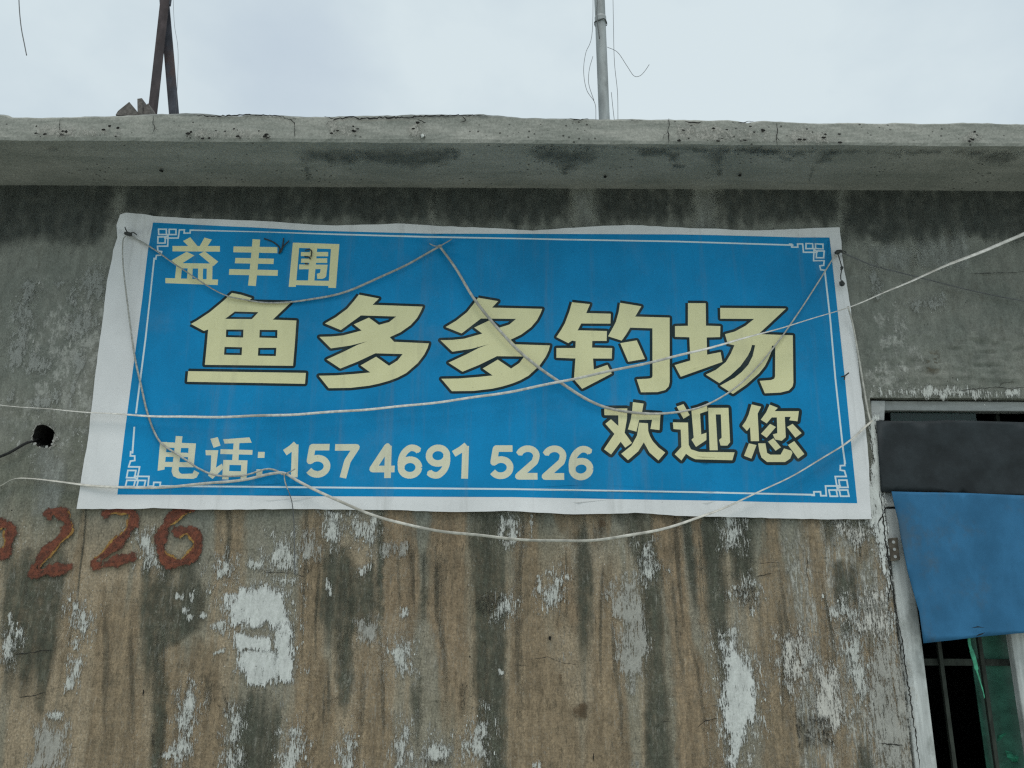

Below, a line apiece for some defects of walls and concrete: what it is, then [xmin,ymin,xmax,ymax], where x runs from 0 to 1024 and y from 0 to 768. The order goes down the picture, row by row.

leakage [0,185,112,242]
leakage [126,178,568,227]
leakage [724,189,1024,243]
leakage [2,532,84,707]
leakage [85,559,281,768]
leakage [215,509,244,581]
peeling [175,509,410,690]
peeling [352,614,422,686]
leakage [294,509,631,768]
peeling [601,534,672,695]
leakage [630,513,873,768]
peeling [701,413,917,768]